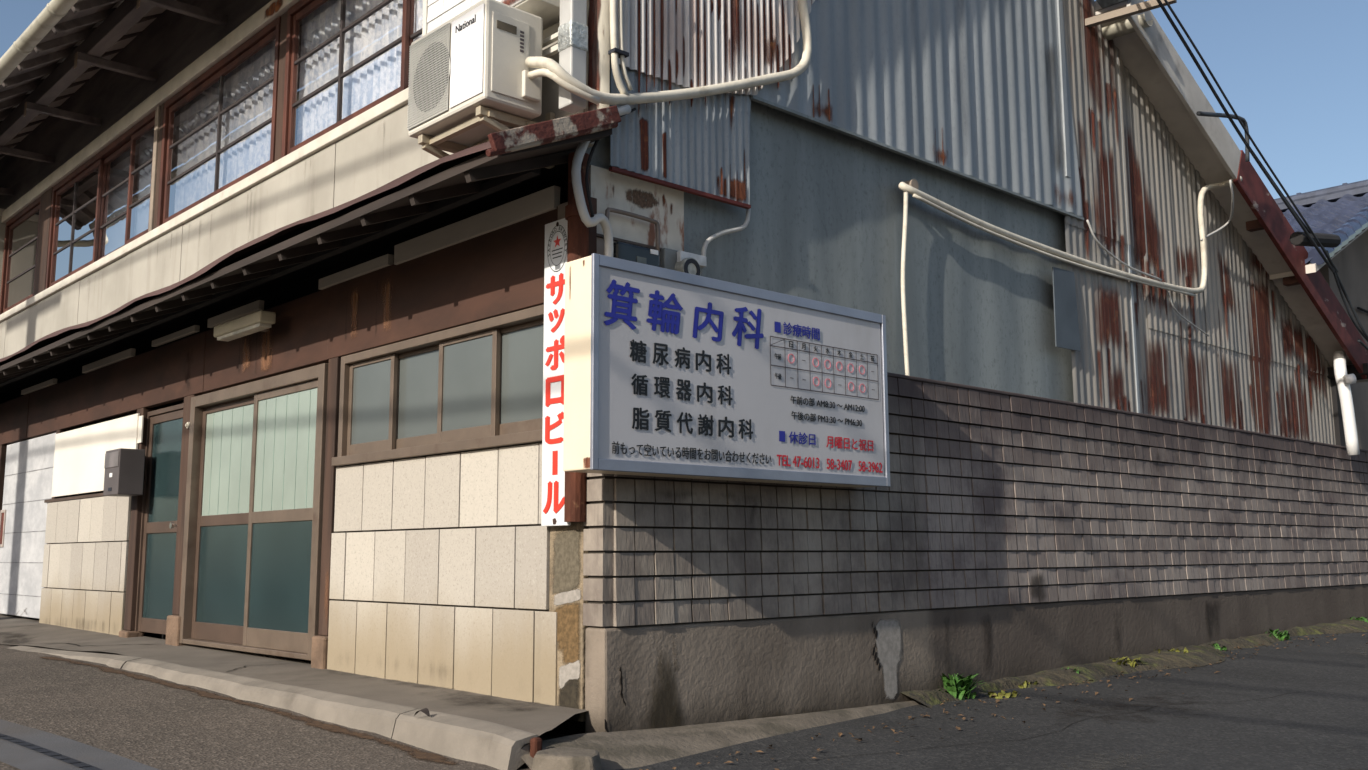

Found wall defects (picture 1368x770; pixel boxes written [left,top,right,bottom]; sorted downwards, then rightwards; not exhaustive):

rust [588,0,604,110]
rust [638,0,791,178]
rust [813,85,832,122]
rust [1056,0,1326,438]
leakage [1032,576,1043,601]